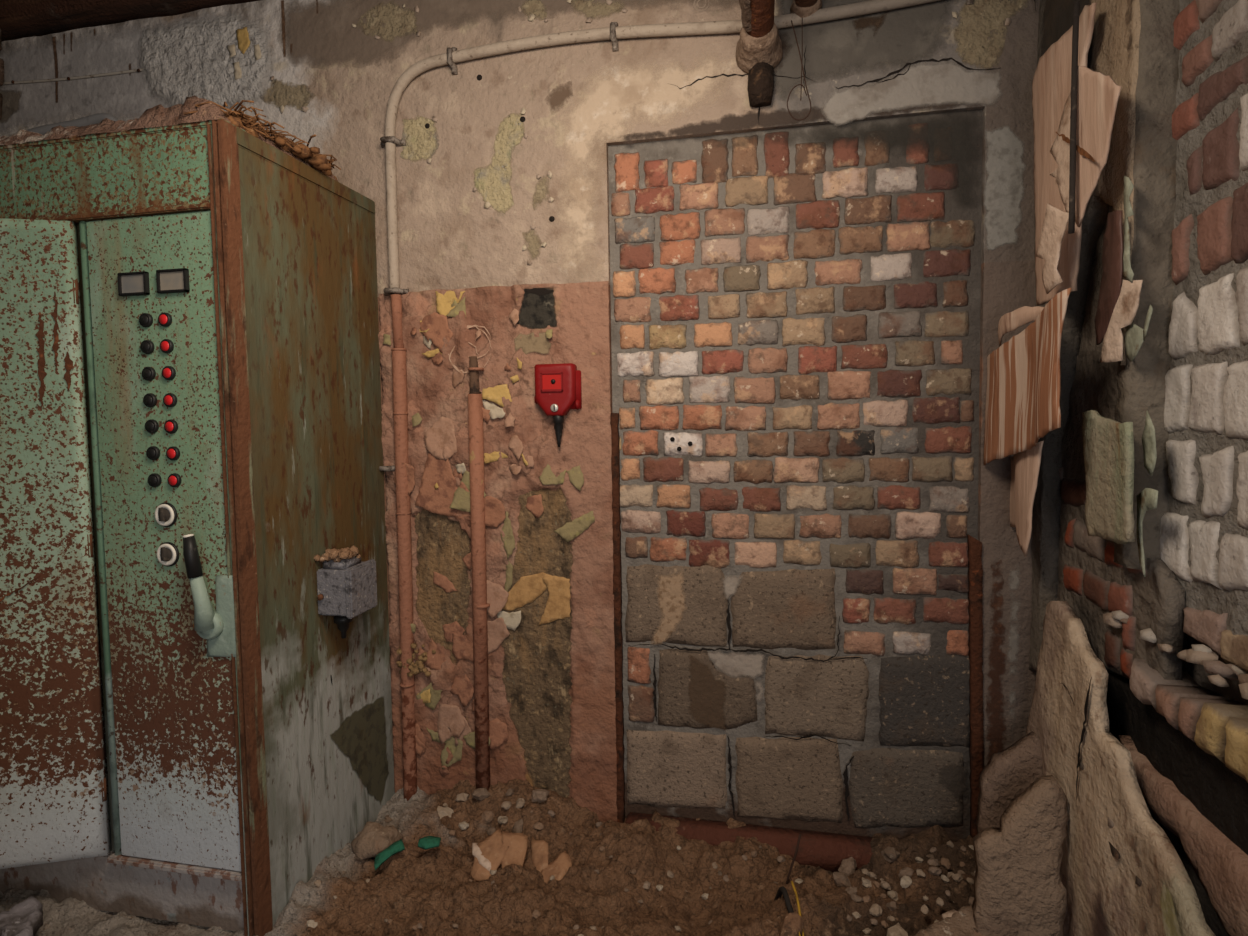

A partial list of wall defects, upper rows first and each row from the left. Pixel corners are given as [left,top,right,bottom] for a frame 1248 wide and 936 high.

spalling [352,2,421,42]
spalling [567,0,628,23]
crack [672,49,998,89]
spalling [400,116,439,164]
spalling [522,224,547,265]
peeling [983,3,1122,556]
peeling [1095,176,1153,363]
peeling [378,281,617,822]
crack [628,578,868,722]
flaking render [1026,410,1216,936]
crack [727,736,735,817]
crack [766,734,854,821]